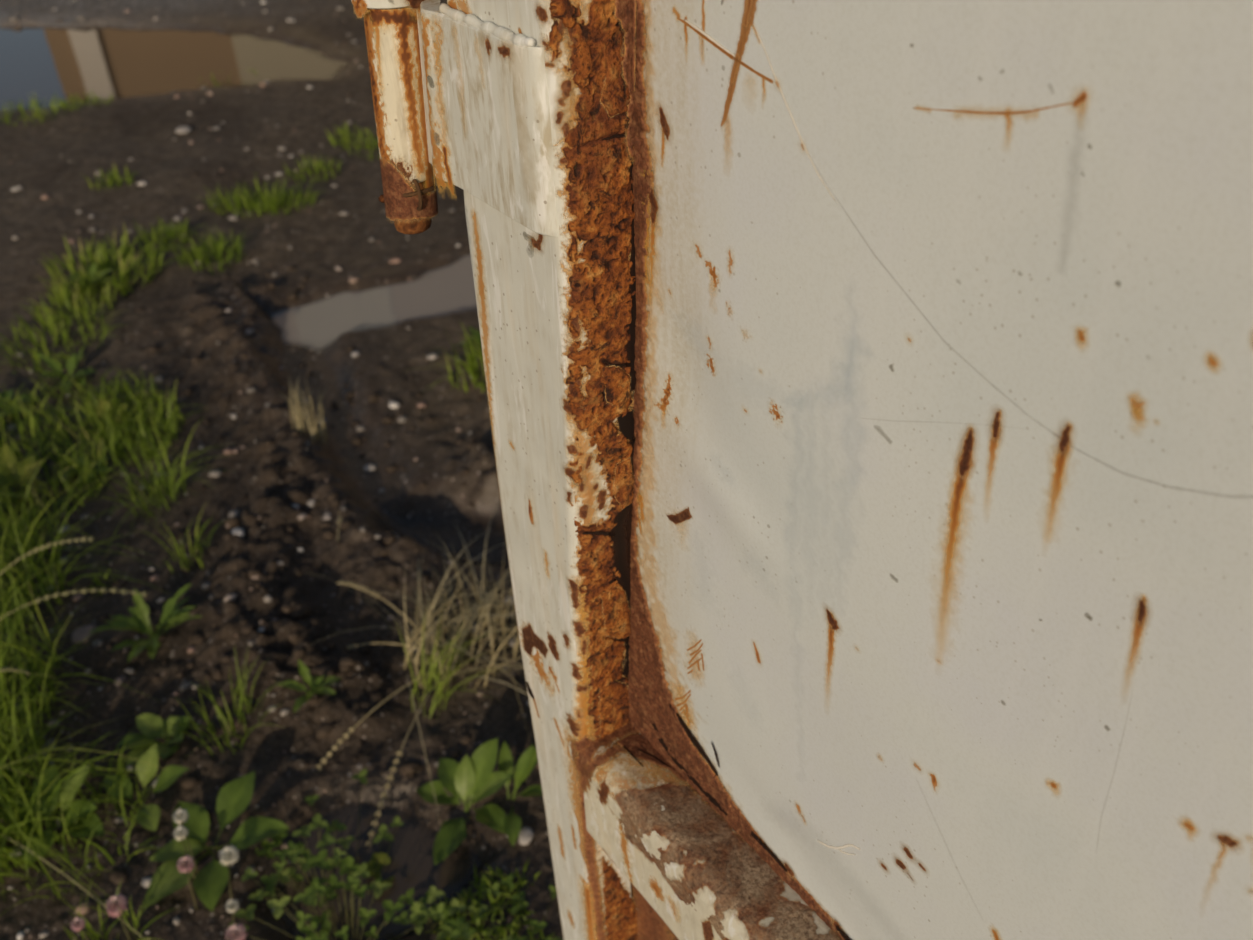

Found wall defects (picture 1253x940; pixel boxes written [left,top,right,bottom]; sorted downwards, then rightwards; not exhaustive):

rust [352,0,454,195]
rust [468,212,494,447]
rust [526,0,850,940]
rust [945,428,974,581]
rust [989,411,1001,475]
rust [1052,424,1072,506]
rust [1130,597,1146,661]
peeling [598,780,841,940]
rust [881,847,926,879]
rust [1217,835,1238,857]